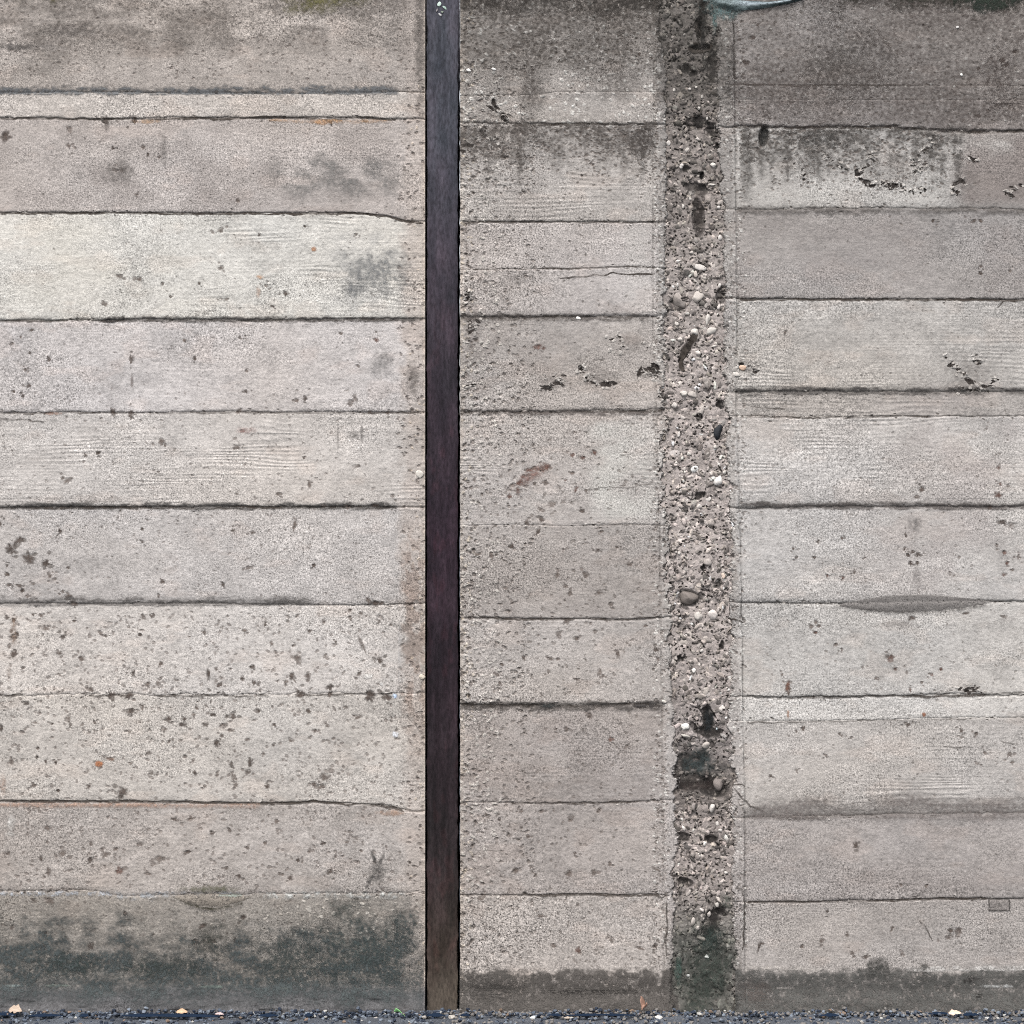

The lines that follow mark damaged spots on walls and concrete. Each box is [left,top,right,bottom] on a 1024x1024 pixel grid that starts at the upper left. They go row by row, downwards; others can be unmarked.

leakage [658,0,1024,182]
spalling [823,150,926,197]
spalling [540,365,617,391]
spalling [945,354,999,395]
leakage [459,969,679,1015]
leakage [735,959,1024,1016]